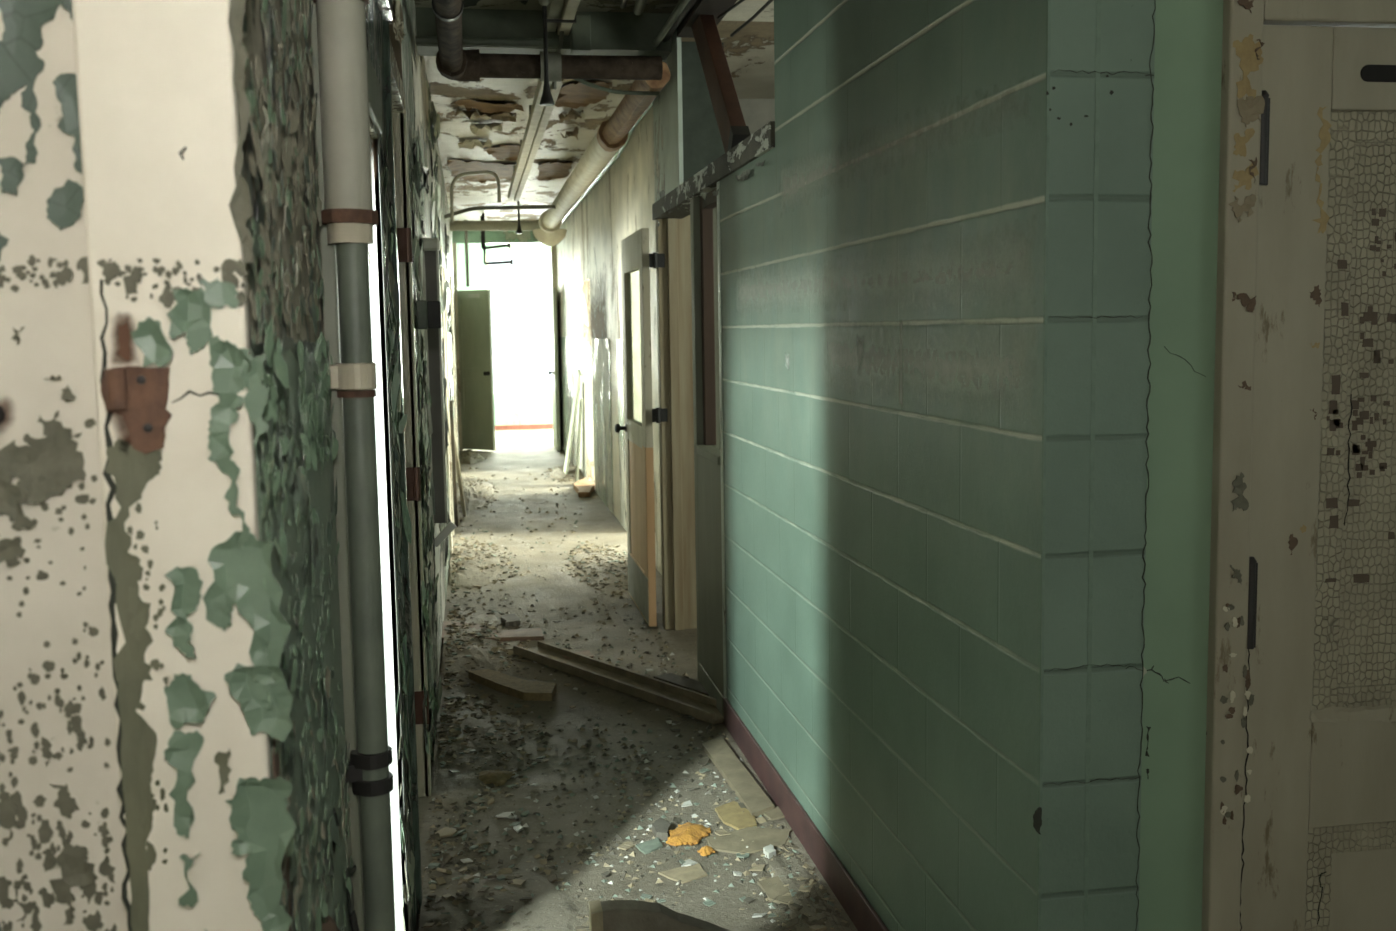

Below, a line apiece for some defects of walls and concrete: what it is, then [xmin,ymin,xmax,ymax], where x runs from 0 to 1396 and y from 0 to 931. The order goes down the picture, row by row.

peeling [1237,0,1254,12]
peeling [555,81,611,140]
peeling [1228,34,1265,222]
peeling [537,162,572,181]
rust [113,316,135,363]
crack [1044,0,1206,931]
crack [1344,394,1353,525]
peeling [1223,603,1244,631]
peeling [1220,653,1254,728]
peeling [1220,746,1253,825]